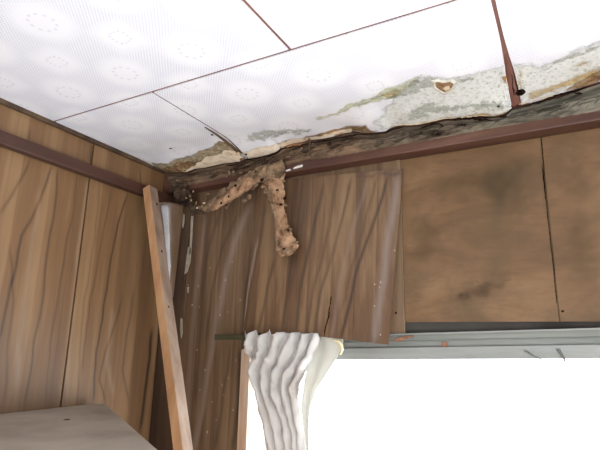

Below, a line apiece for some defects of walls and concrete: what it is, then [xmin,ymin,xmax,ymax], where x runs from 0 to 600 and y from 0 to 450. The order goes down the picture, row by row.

damp [248,66,511,142]
spalling [431,79,457,95]
damp [513,43,600,103]
peeling [205,127,248,175]